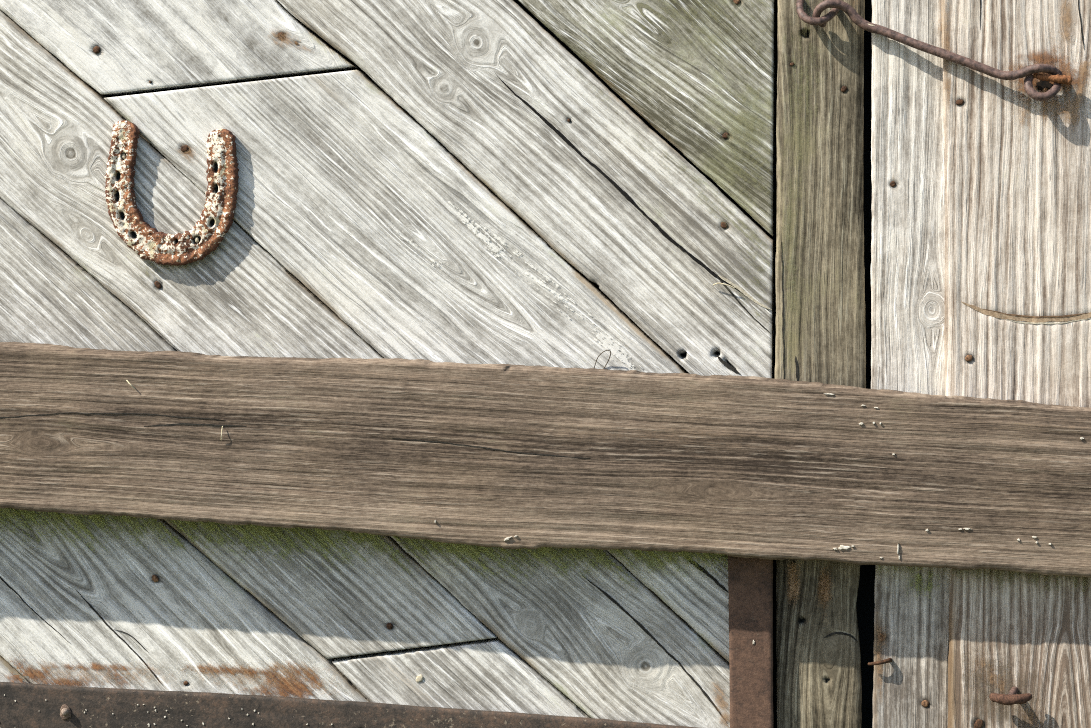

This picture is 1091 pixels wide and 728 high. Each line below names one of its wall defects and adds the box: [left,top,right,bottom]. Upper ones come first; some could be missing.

rust [1018,50,1087,123]
rust [7,663,134,687]
rust [199,666,321,698]